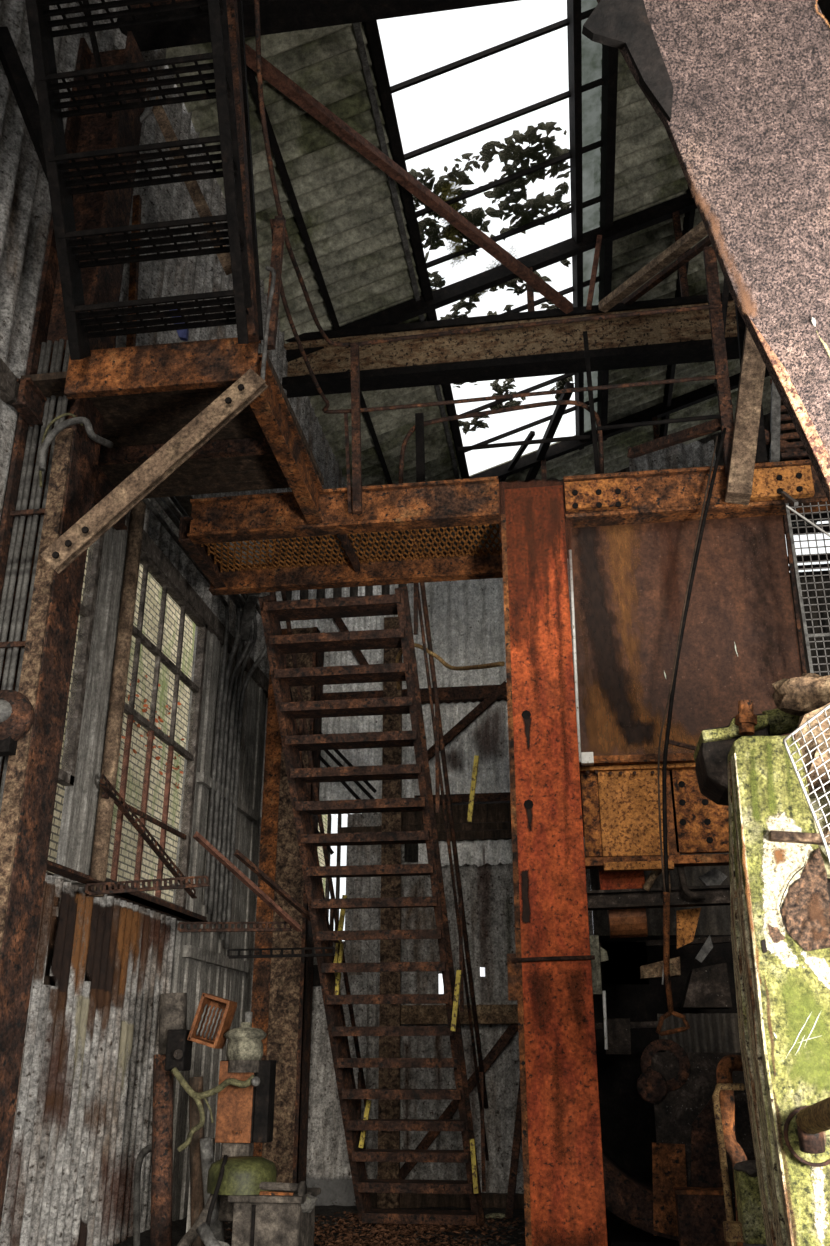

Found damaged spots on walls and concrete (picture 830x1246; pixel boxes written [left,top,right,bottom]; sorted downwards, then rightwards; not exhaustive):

rust [580,525,699,754]
rust [523,718,532,749]
rust [525,808,533,831]
water stain [750,744,791,821]
rust [33,882,58,979]
rust [71,892,94,992]
rust [109,903,171,1008]
rust [521,870,531,923]
rust [84,1105,107,1131]
rust [71,1219,88,1246]
water stain [811,1166,829,1246]